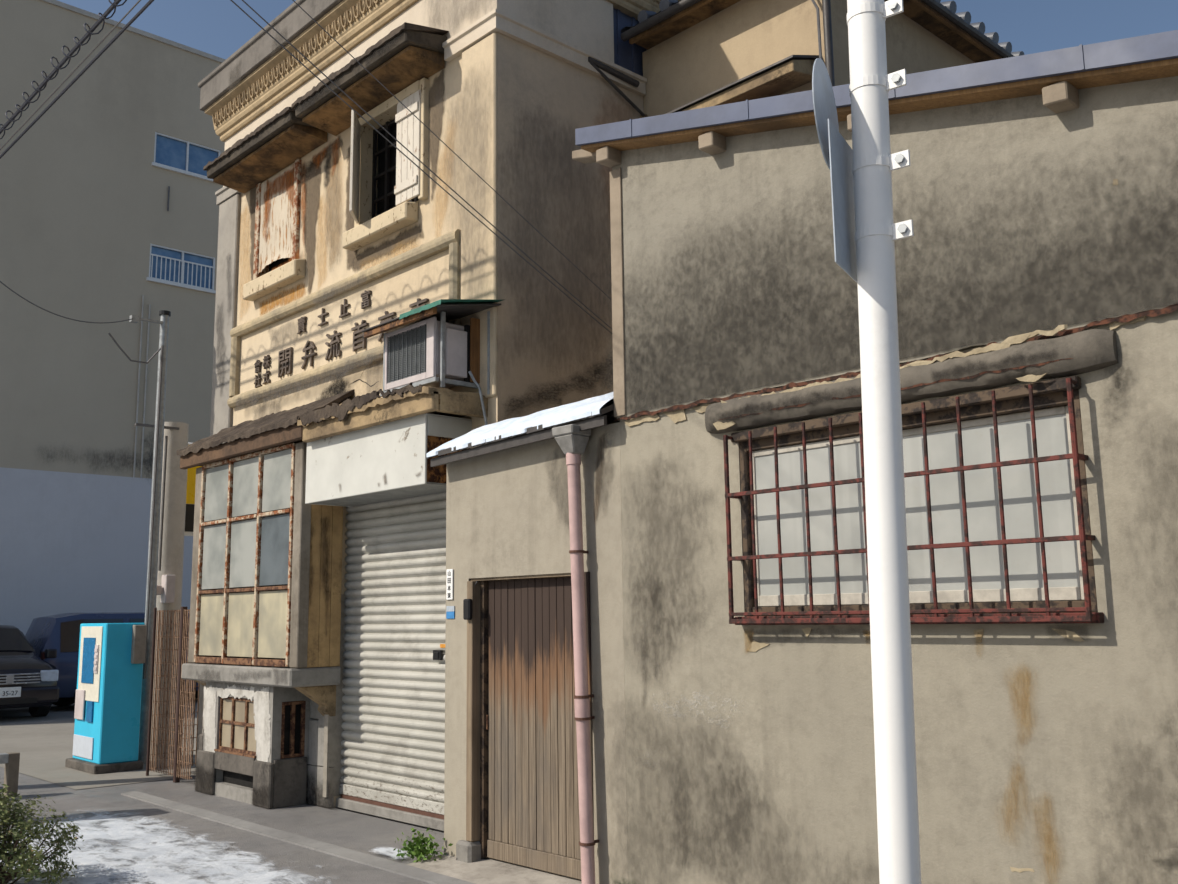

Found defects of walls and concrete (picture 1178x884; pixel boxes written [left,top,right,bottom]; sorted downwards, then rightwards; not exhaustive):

corrosion [264,141,338,270]
mould [895,196,1178,359]
mould [625,241,860,412]
water stain [932,352,1055,378]
water stain [720,388,861,421]
flaking render [746,640,769,652]
flaking render [1053,629,1084,642]
peeling [203,684,271,762]